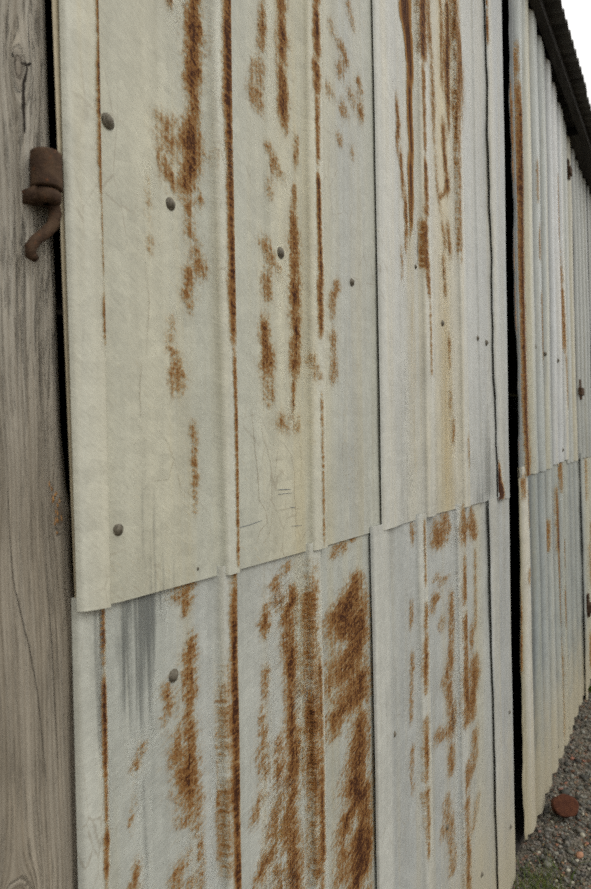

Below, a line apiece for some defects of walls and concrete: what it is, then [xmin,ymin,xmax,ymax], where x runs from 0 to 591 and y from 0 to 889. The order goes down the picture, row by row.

rust [127,860,140,889]
rust [166,318,186,395]
rust [155,0,208,314]
rust [160,629,206,889]
rust [170,581,197,617]
rust [190,424,199,513]
rust [215,0,376,889]
rust [395,0,464,375]
rust [409,504,481,889]
rust [510,42,531,503]